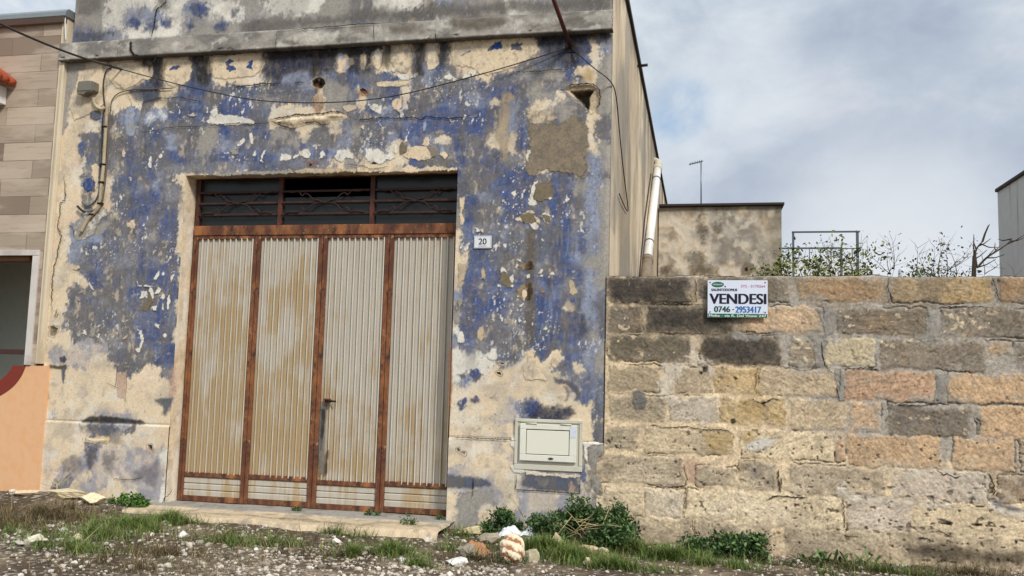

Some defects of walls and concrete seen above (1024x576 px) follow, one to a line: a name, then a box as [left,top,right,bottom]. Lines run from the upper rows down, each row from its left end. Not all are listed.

peeling [70,58,193,120]
peeling [210,53,263,79]
peeling [311,38,538,117]
peeling [204,108,457,176]
flaking render [515,83,602,230]
crack [51,177,74,317]
damp [742,262,753,275]
peeling [137,271,174,338]
damp [50,356,67,382]
damp [156,367,177,415]
damp [81,416,144,466]
rust [319,403,328,474]